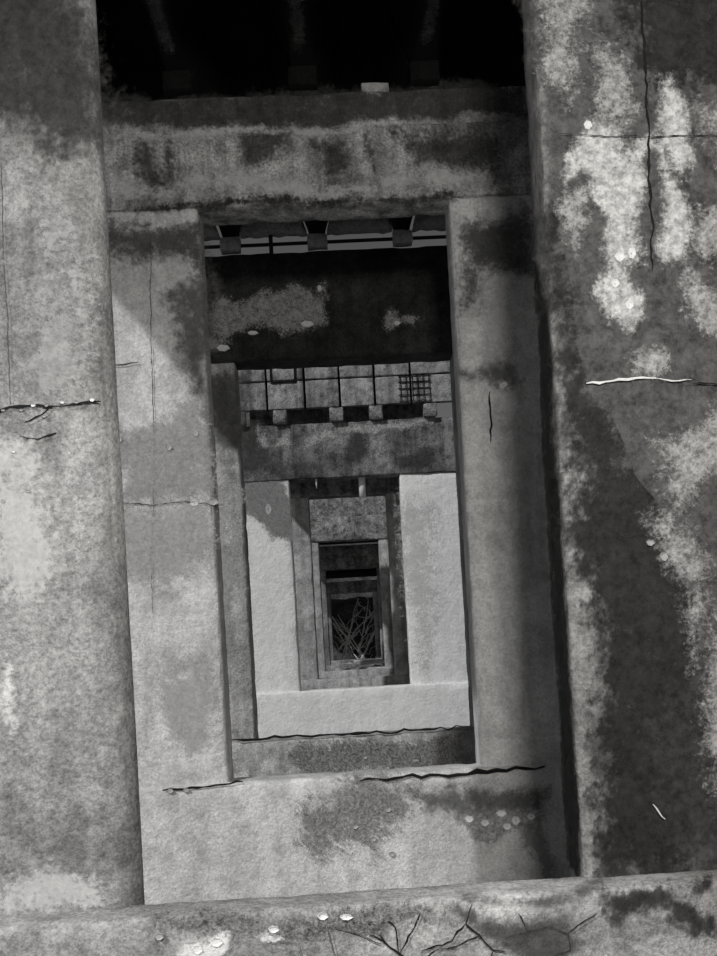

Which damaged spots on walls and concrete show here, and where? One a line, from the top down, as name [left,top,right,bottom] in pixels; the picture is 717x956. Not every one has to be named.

damp [415,0,717,941]
crack [162,780,243,793]
crack [360,765,545,782]
crack [300,905,505,956]
damp [454,893,575,956]